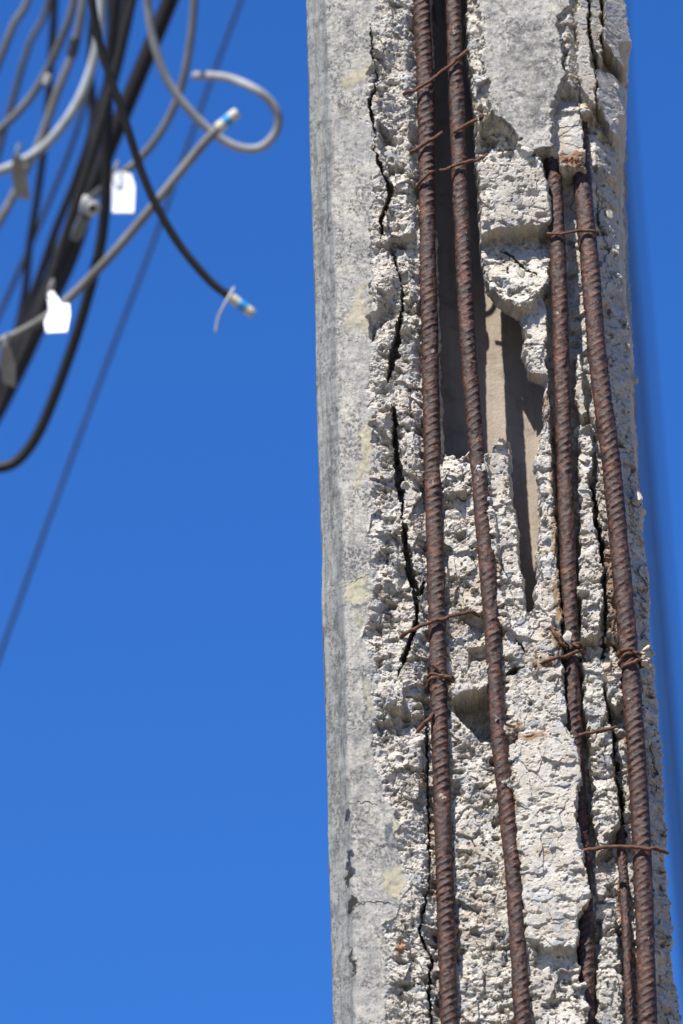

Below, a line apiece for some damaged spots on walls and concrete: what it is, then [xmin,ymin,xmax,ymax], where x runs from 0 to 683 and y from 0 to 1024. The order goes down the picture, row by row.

corrosion [558,150,584,186]
crack [367,23,425,676]
spalling [361,0,441,1024]
crack [417,716,434,1024]
corrosion [508,722,545,740]
corrosion [530,396,563,669]
spalling [429,0,682,1024]
corrosion [598,544,619,655]